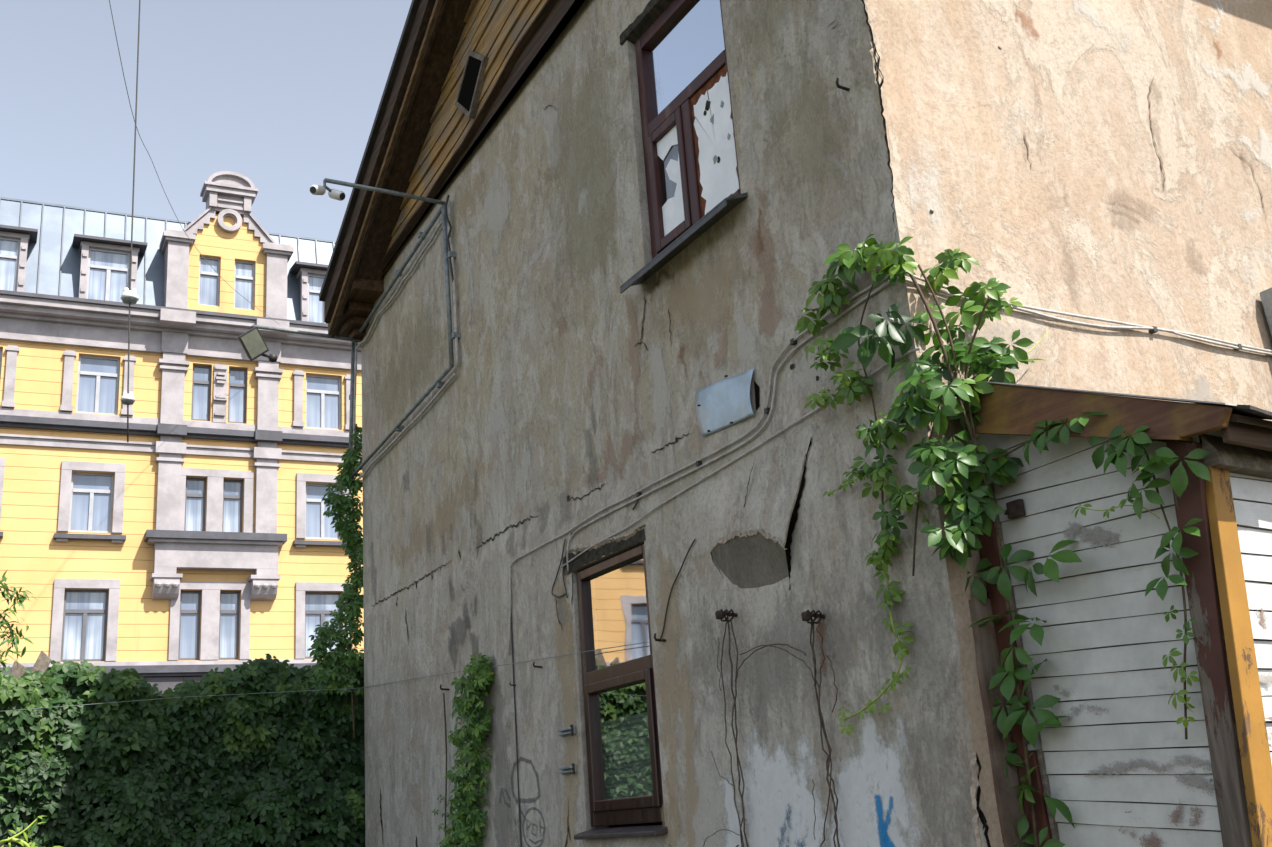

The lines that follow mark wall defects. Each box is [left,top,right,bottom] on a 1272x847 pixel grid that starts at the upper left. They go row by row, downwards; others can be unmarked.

peeling [1196,58,1270,96]
crack [827,0,897,236]
peeling [1240,129,1272,168]
crack [650,433,691,455]
crack [784,437,812,590]
crack [373,515,539,637]
crack [556,562,574,630]
crack [970,752,991,847]
peeling [1120,828,1162,847]
peeling [1168,803,1203,826]